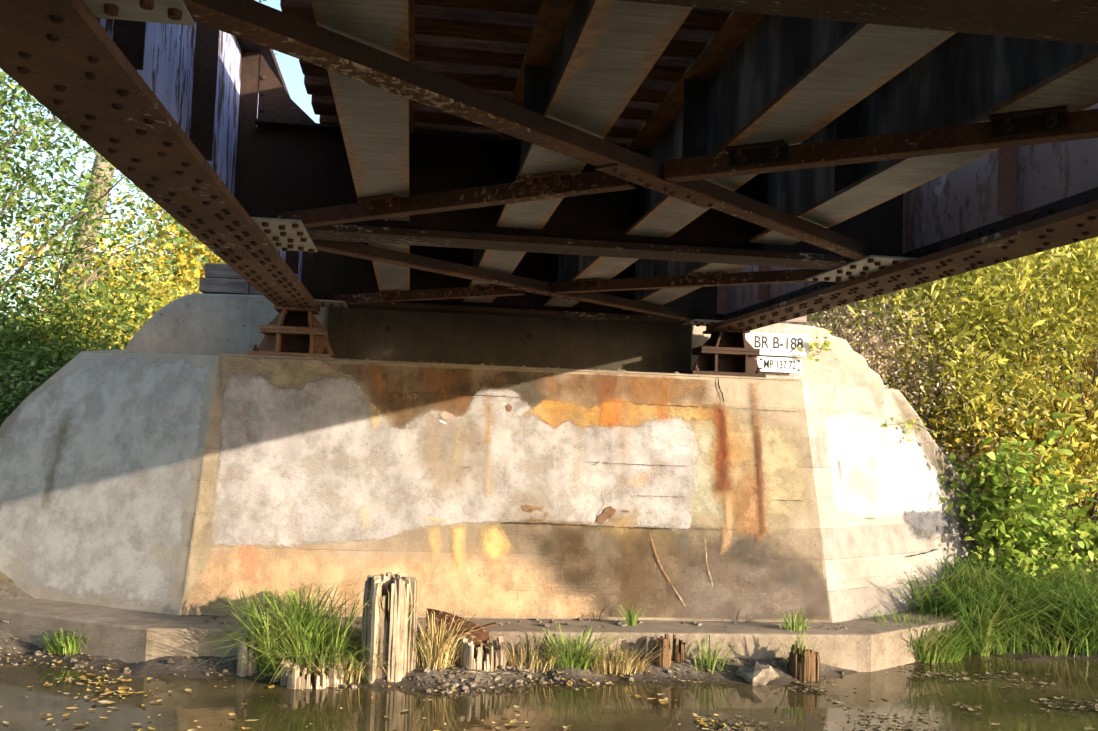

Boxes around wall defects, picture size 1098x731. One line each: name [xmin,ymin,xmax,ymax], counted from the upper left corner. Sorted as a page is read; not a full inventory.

peeling [212,372,697,547]
rust [713,388,767,549]
peeling [825,413,942,517]
damp [904,443,976,543]